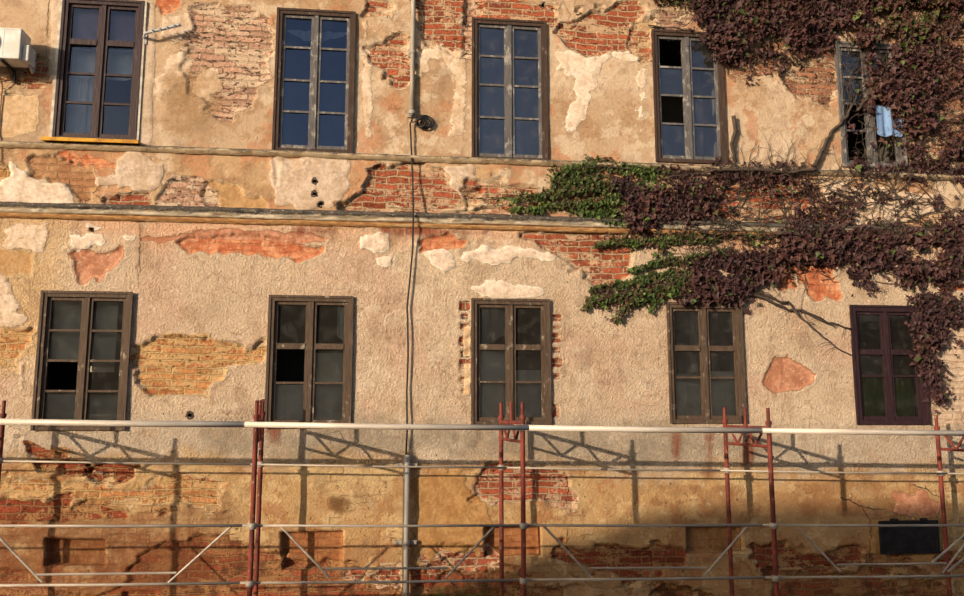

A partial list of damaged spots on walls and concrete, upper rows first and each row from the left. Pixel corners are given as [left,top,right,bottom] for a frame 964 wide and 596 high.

flaking render [0,0,953,226]
flaking render [67,223,327,285]
peeling [359,232,392,267]
peeling [0,222,49,396]
flaking render [129,332,267,420]
flaking render [762,354,816,393]
flaking render [931,325,964,426]
flaking render [0,434,224,528]
flaking render [0,461,720,596]
flaking render [746,532,964,596]